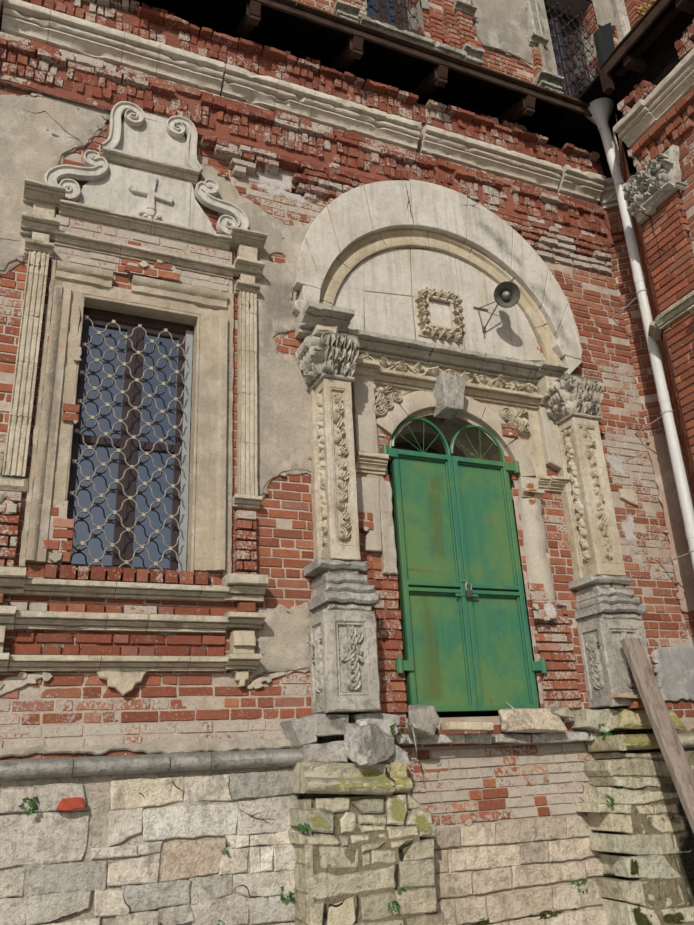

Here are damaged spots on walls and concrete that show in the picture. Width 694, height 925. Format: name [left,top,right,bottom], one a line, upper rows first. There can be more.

flaking render [471,0,534,70]
flaking render [0,91,111,274]
flaking render [0,671,53,696]
flaking render [238,602,313,689]
mould [667,783,694,905]